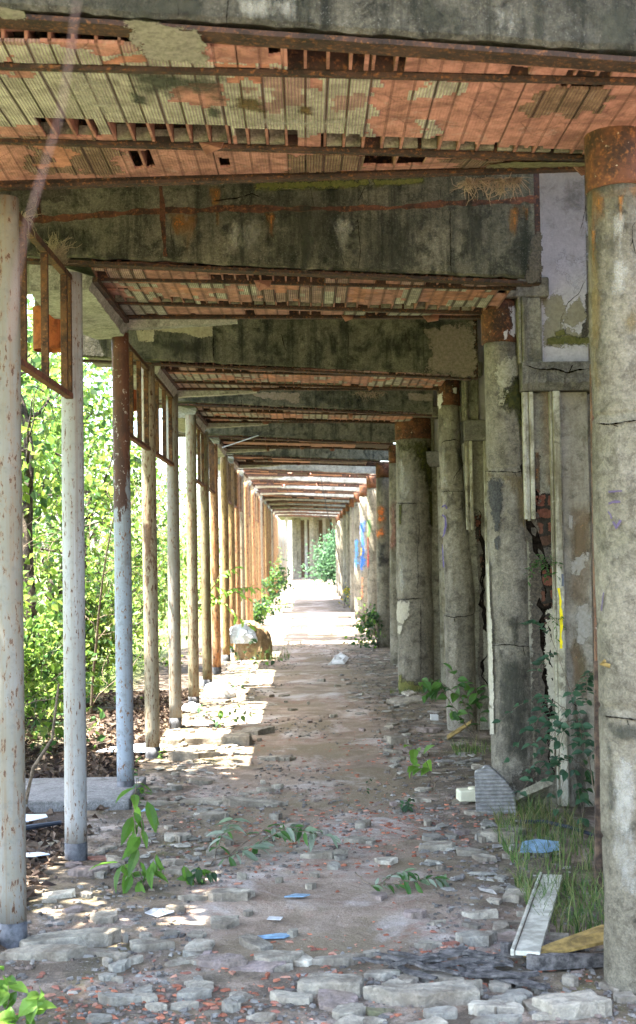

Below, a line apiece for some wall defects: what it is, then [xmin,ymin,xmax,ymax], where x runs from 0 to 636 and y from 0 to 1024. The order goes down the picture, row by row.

flaking render [542,293,589,348]
flaking render [423,320,479,378]
crack [526,365,589,373]
crack [598,419,636,427]
flaking render [396,600,410,634]
crack [396,426,556,782]